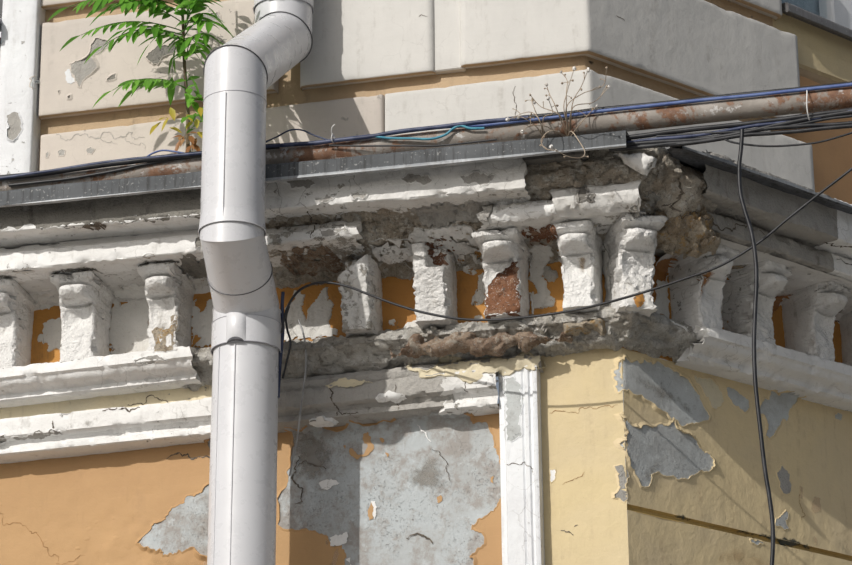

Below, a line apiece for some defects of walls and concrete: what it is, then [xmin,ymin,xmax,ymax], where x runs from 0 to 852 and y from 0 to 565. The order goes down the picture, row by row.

peeling [5,111,24,143]
peeling [0,189,201,233]
spalling [515,147,721,259]
peeling [37,318,62,352]
peeling [107,283,169,366]
peeling [166,236,214,392]
spalling [265,204,717,504]
crack [103,395,168,412]
crack [167,452,210,460]
peeling [276,371,525,565]
crack [1,513,85,564]
peeling [135,481,209,562]